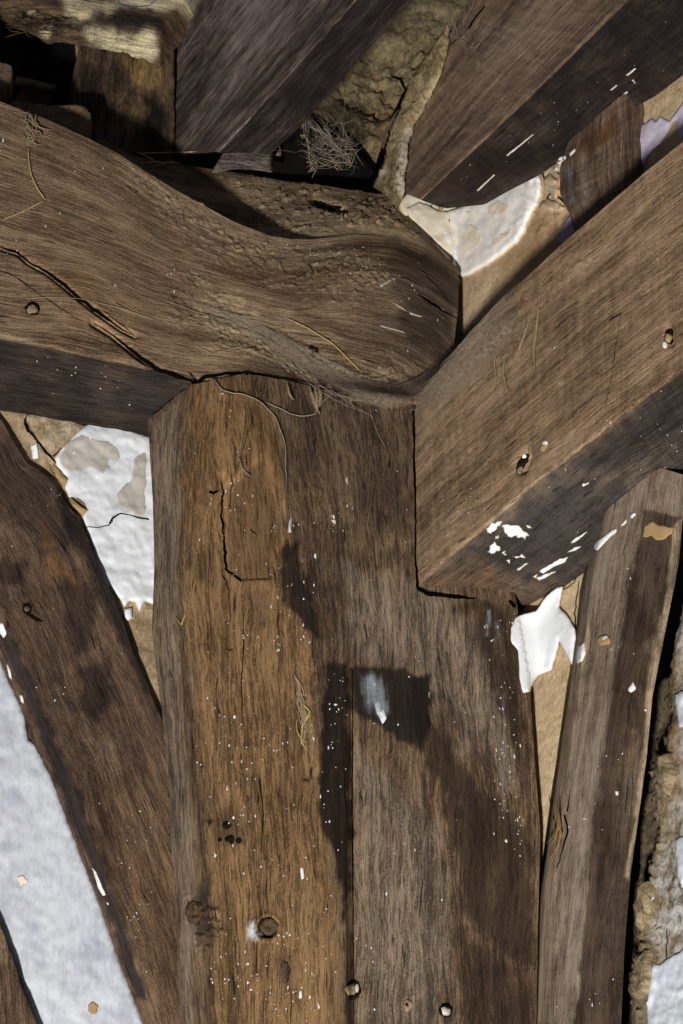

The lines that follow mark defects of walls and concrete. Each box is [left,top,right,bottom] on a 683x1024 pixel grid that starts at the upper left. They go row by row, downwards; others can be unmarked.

flaking render [406,174,543,278]
peeling [555,215,575,245]
crack [0,246,277,384]
flaking render [30,442,39,459]
flaking render [55,425,154,621]
crack [83,513,149,528]
crack [208,420,252,716]
peeling [511,586,585,693]
leakage [318,663,532,957]
crack [549,795,570,868]